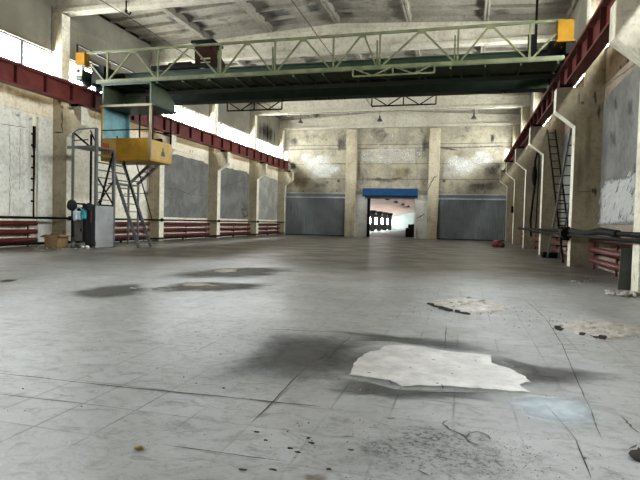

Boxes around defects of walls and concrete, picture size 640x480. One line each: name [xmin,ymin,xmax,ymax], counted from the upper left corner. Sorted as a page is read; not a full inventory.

peeling [598,171,636,225]
water stain [160,282,260,291]
spalling [427,302,470,315]
crack [530,304,601,436]
crack [442,420,490,445]
crack [543,402,591,477]